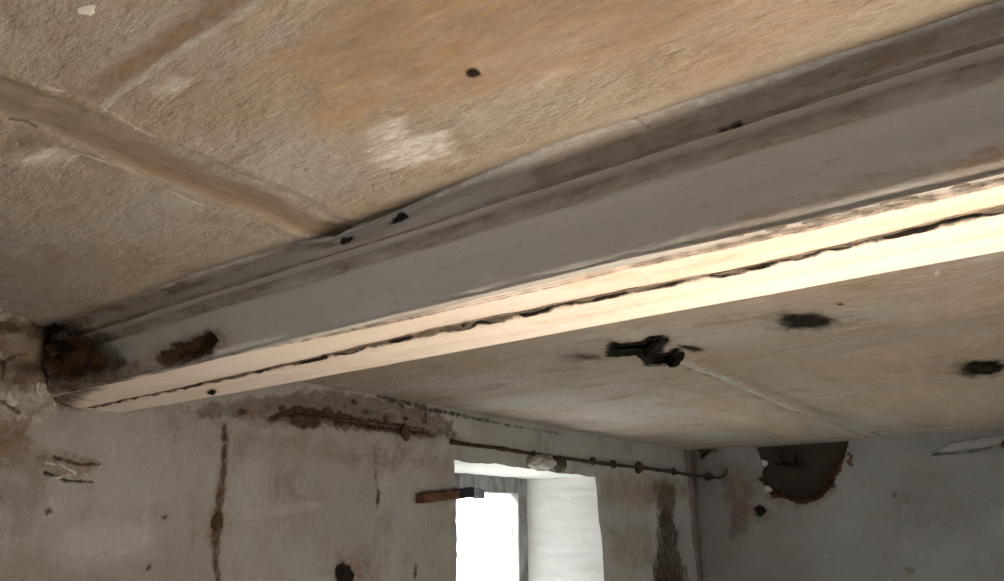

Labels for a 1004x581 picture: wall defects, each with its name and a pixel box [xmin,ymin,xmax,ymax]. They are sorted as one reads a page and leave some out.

spalling [0,309,100,483]
spalling [155,331,220,368]
crack [68,177,1004,408]
spalling [756,439,849,507]